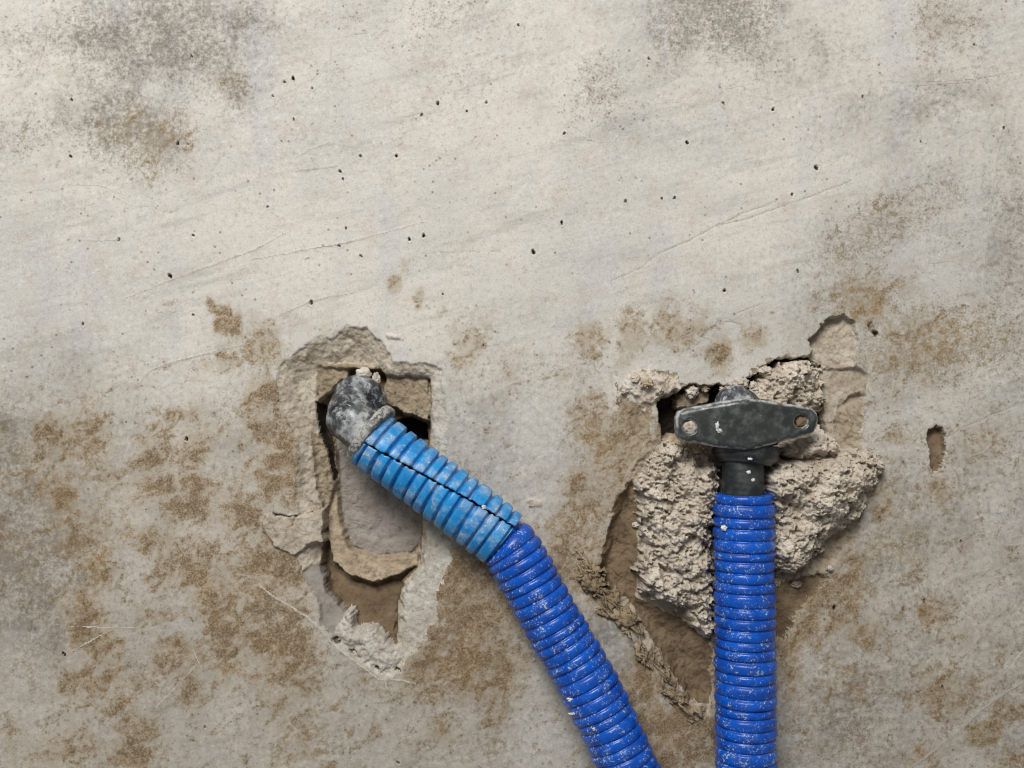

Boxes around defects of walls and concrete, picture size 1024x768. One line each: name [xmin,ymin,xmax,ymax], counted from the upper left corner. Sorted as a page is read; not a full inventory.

crack [612,180,852,281]
water stain [0,359,136,701]
spalling [263,327,454,680]
spalling [577,369,730,725]
spalling [742,315,878,454]
spalling [774,483,879,669]
spalling [926,424,946,477]